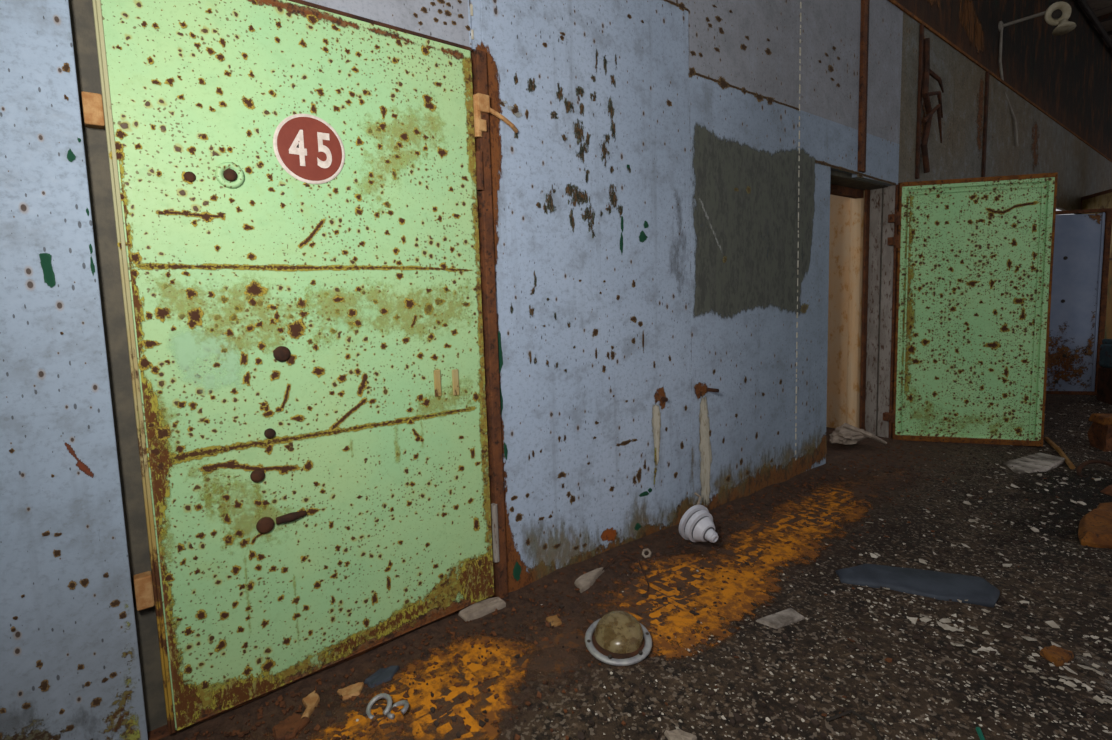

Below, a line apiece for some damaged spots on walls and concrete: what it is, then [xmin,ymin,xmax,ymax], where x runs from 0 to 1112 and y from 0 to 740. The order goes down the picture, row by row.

peeling [692,124,815,319]
rust [892,122,1098,447]
rust [61,435,94,478]
leakage [617,382,820,542]
rust [42,530,62,558]
leakage [528,525,600,575]
rust [68,578,89,590]
rust [36,660,50,692]
rust [77,643,140,740]
rust [0,702,75,740]